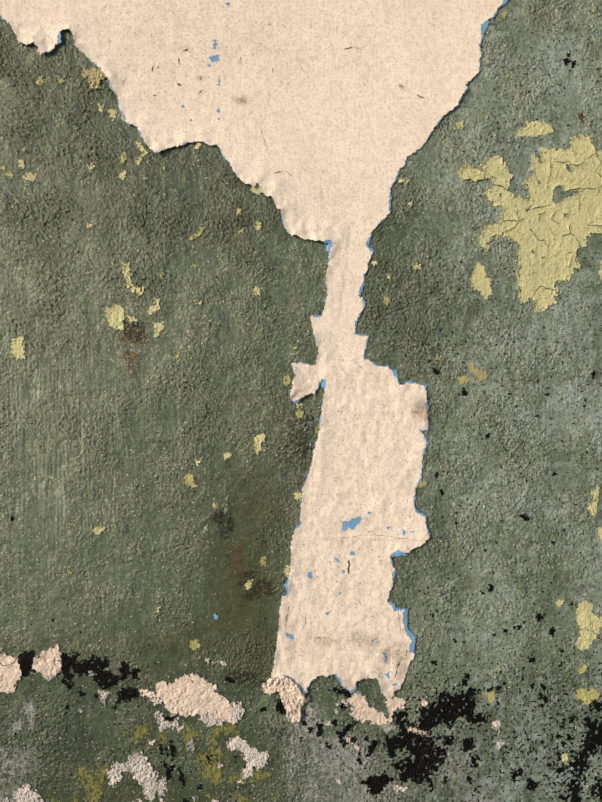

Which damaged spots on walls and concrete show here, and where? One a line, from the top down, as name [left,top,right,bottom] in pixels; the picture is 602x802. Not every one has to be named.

peeling [516,120,554,138]
crack [505,150,602,237]
peeling [0,0,509,749]
peeling [530,684,551,707]
peeling [69,765,110,802]
peeling [123,722,272,802]
peeling [541,686,602,802]